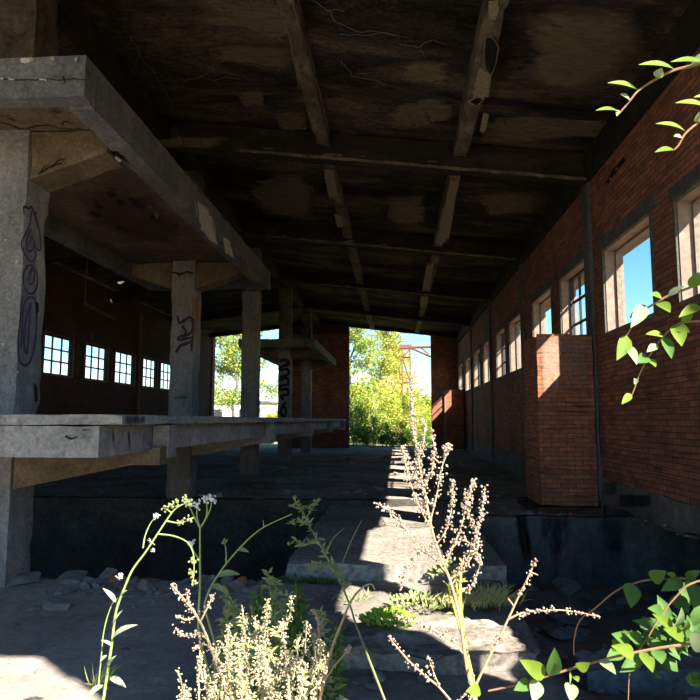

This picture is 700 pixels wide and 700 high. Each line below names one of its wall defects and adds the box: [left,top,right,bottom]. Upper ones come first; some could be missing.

spalling [488,0,499,20]
crack [312,0,446,58]
crack [0,75,86,83]
peeling [402,61,450,82]
spalling [468,35,500,107]
crack [0,110,84,130]
peeling [387,99,452,128]
crack [39,158,65,174]
water stain [518,516,530,557]